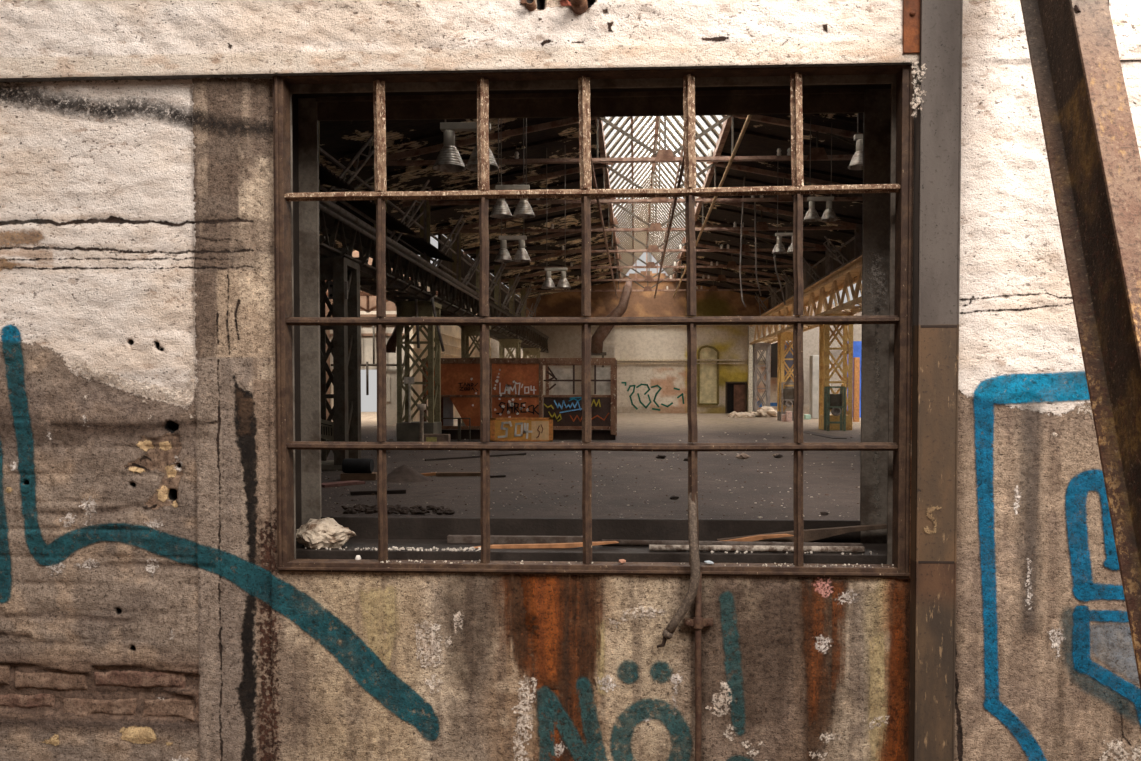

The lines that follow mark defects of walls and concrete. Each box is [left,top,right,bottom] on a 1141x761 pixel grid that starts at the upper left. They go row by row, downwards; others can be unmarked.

spalling [526,0,613,32]
crack [959,292,1073,314]
crack [0,215,254,761]
spalling [71,361,197,510]
water stain [232,375,258,564]
spalling [0,663,200,746]
water stain [237,584,258,761]
rust [259,508,282,761]
rust [504,574,601,761]
rust [800,577,846,761]
rust [876,581,910,761]